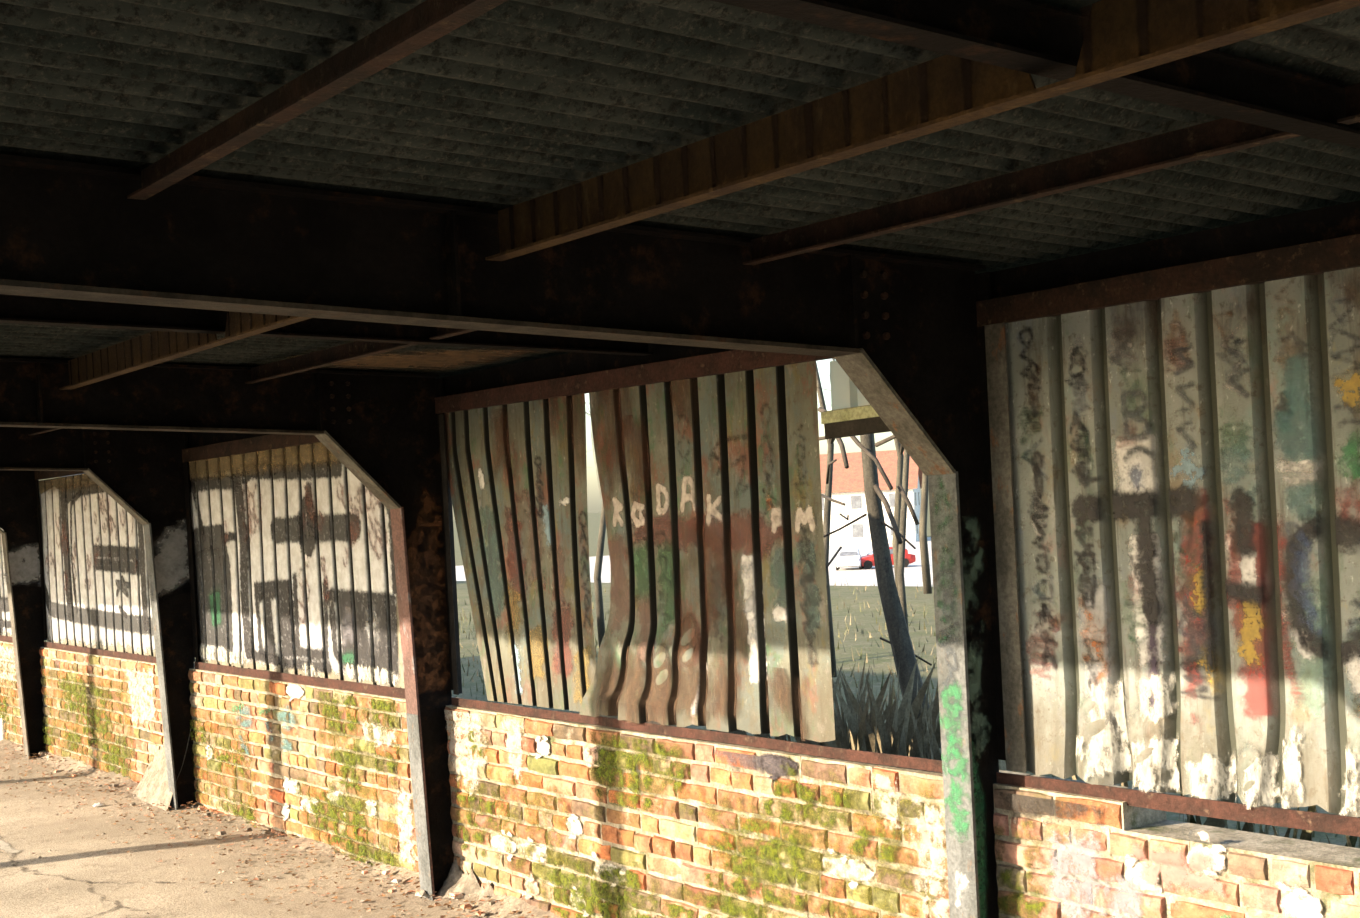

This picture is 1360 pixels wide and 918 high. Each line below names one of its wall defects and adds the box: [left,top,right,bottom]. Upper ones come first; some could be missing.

corrosion [407,489,450,693]
efflorescence [126,668,155,727]
efflorescence [363,724,395,747]
efflorescence [444,709,487,795]
efflorescence [502,720,522,778]
damp [715,750,786,778]
crack [0,837,176,918]
efflorescence [397,789,416,864]
efflorescence [875,774,949,918]
spalling [1187,831,1226,876]
spalling [1276,882,1323,918]